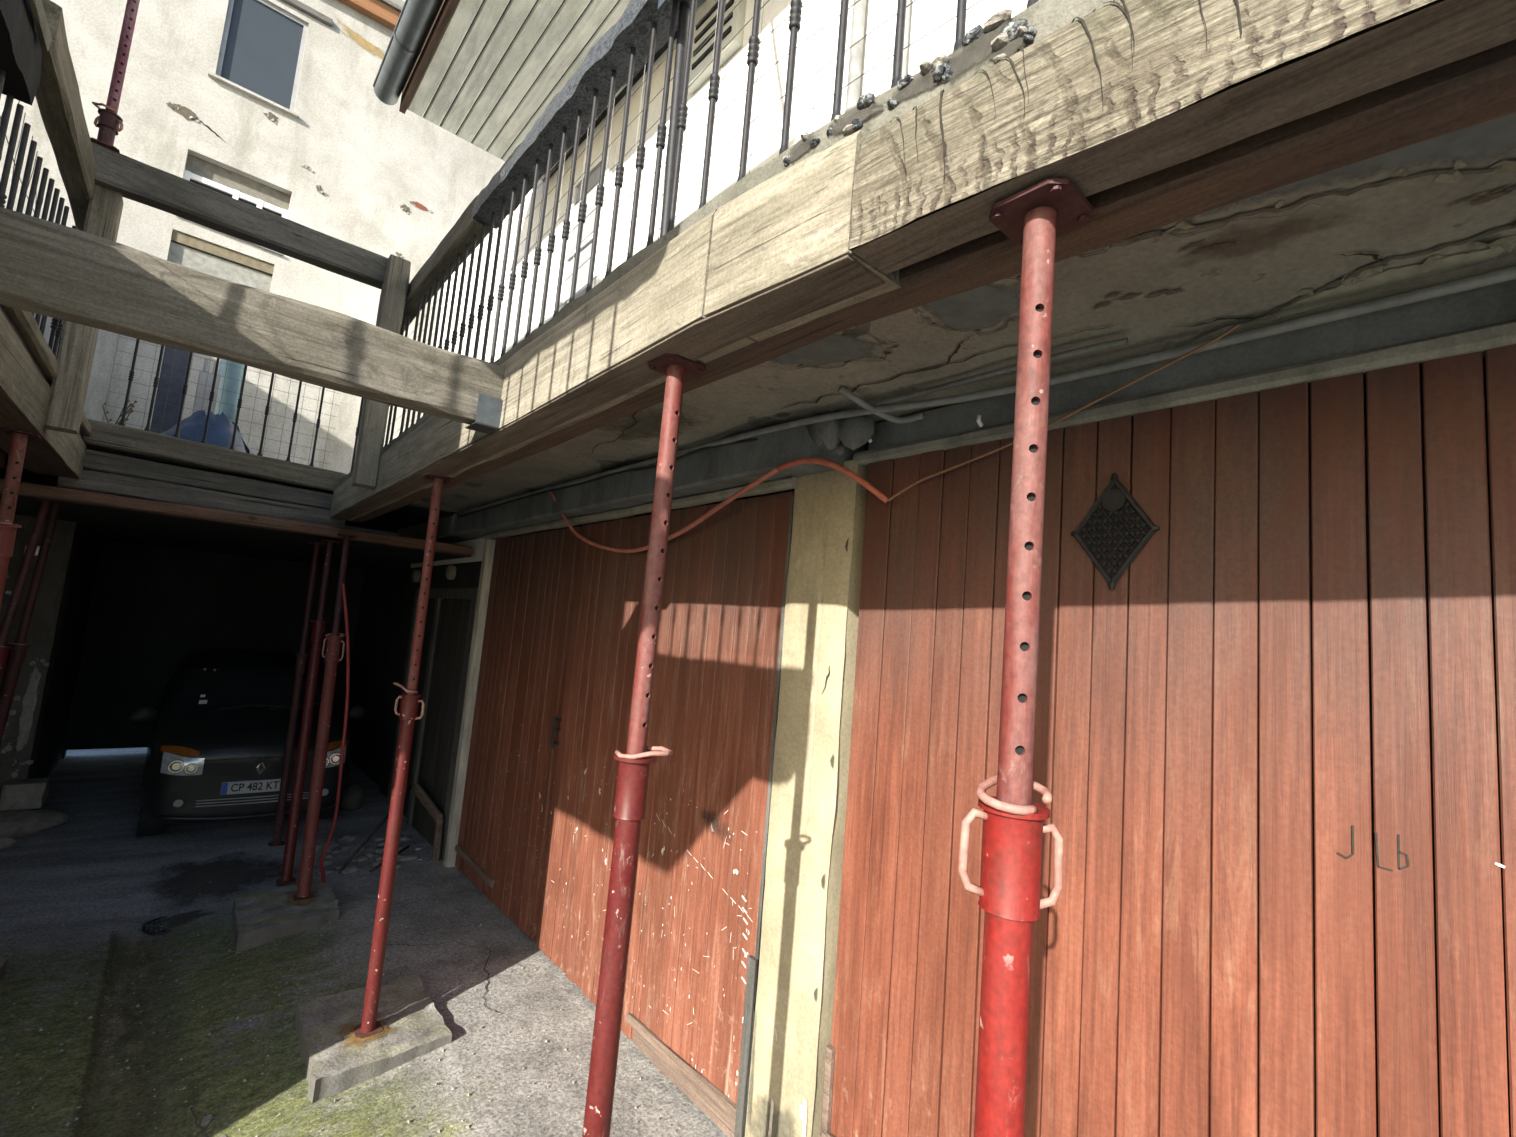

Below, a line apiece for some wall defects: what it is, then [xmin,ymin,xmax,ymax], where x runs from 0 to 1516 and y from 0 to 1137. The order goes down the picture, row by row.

flaking render [912,277,1021,336]
crack [1176,221,1516,347]
water stain [150,853,282,932]
crack [389,942,522,1021]